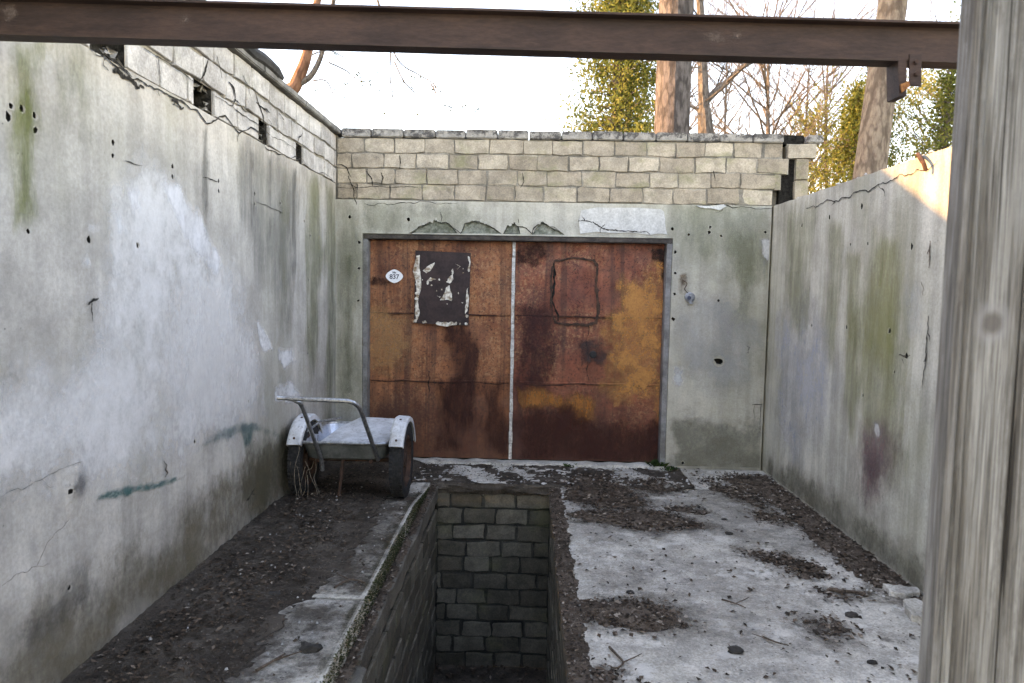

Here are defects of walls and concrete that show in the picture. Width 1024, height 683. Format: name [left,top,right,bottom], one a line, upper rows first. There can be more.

crack [90,48,648,235]
crack [806,164,935,209]
spalling [410,217,520,234]
spalling [533,220,564,235]
corrosion [517,243,546,266]
corrosion [652,249,664,279]